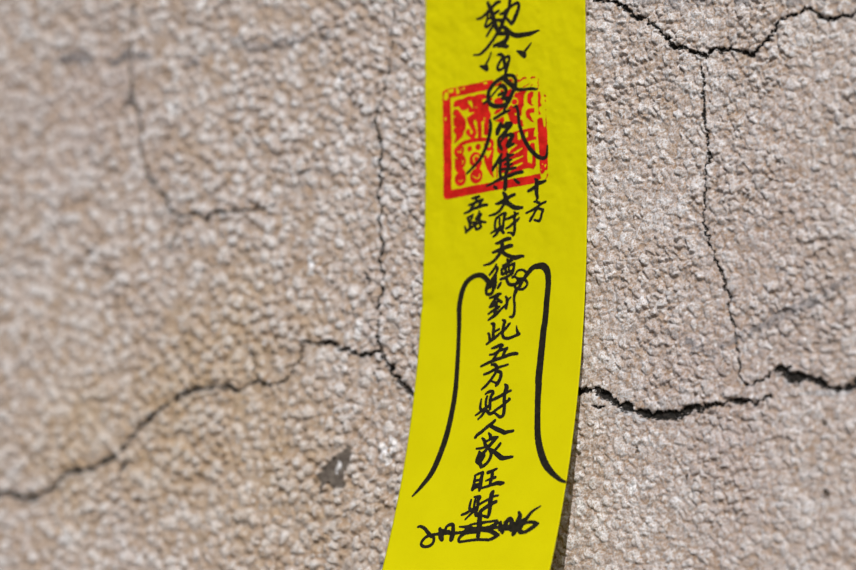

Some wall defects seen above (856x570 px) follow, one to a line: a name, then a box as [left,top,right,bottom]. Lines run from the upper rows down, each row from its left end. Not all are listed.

crack [0,1,414,504]
crack [578,0,856,422]